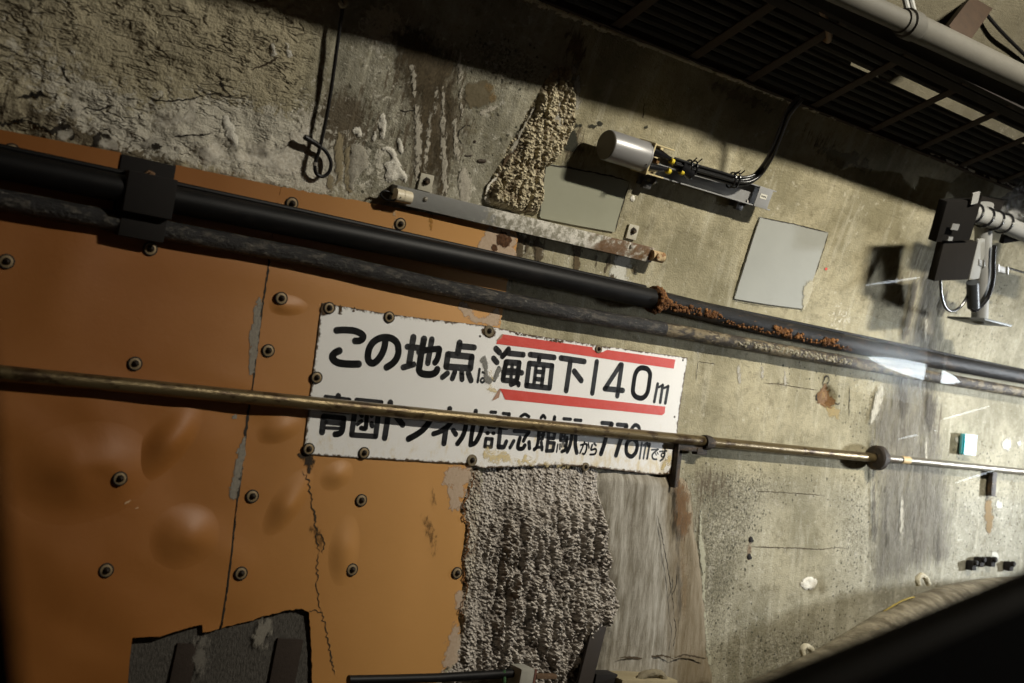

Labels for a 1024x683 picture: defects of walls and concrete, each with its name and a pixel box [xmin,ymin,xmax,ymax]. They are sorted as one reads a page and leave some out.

crack [0,90,57,133]
crack [172,131,210,139]
crack [149,76,237,102]
crack [251,57,279,70]
leakage [326,1,581,215]
peeling [249,297,263,375]
corrosion [652,286,852,351]
peeling [229,436,247,500]
peeling [441,464,473,511]
crack [302,471,335,675]
corrosion [673,480,692,617]
peeling [441,624,461,673]